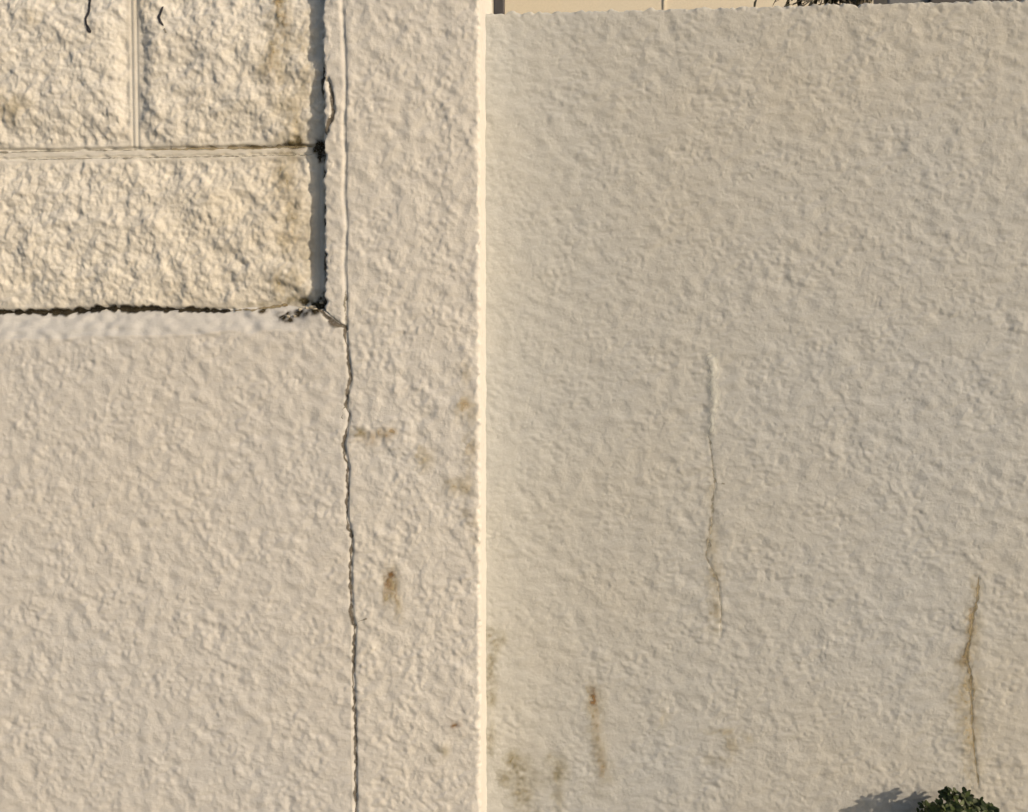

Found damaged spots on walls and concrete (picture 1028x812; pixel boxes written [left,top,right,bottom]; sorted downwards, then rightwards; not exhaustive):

crack [83,0,91,33]
crack [157,6,167,33]
crack [321,62,335,178]
crack [0,303,288,316]
crack [320,252,367,812]
crack [706,436,725,623]
crack [964,577,980,785]